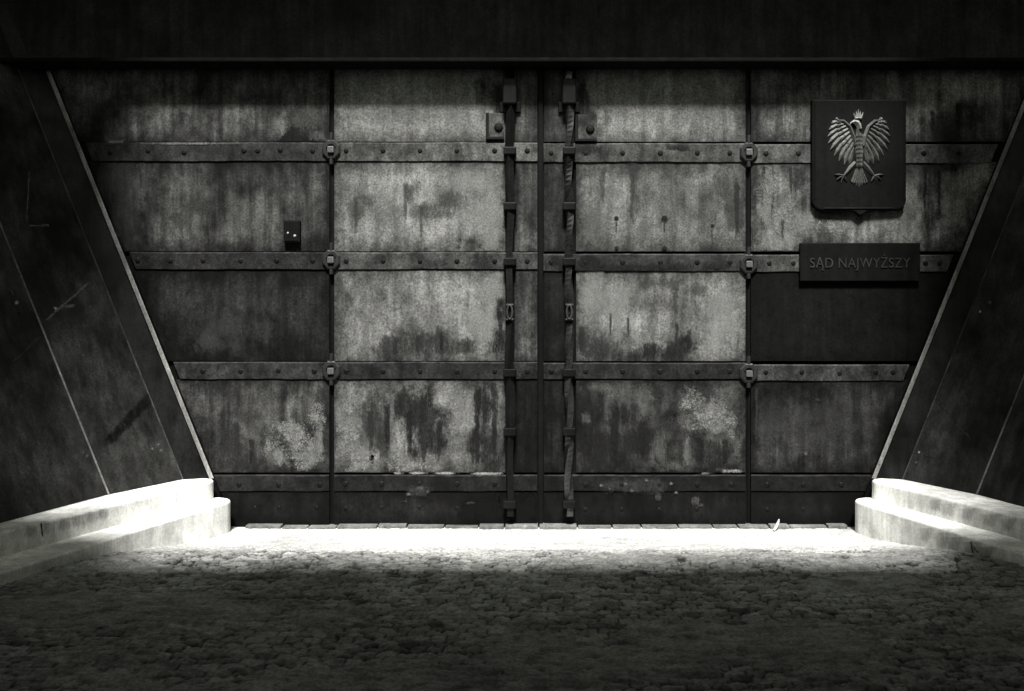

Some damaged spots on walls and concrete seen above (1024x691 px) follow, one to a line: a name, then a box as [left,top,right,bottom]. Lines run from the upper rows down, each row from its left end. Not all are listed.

leakage [404,184,459,230]
leakage [359,316,475,360]
leakage [579,279,704,360]
leakage [362,385,453,475]
leakage [467,381,501,475]
leakage [577,393,653,472]